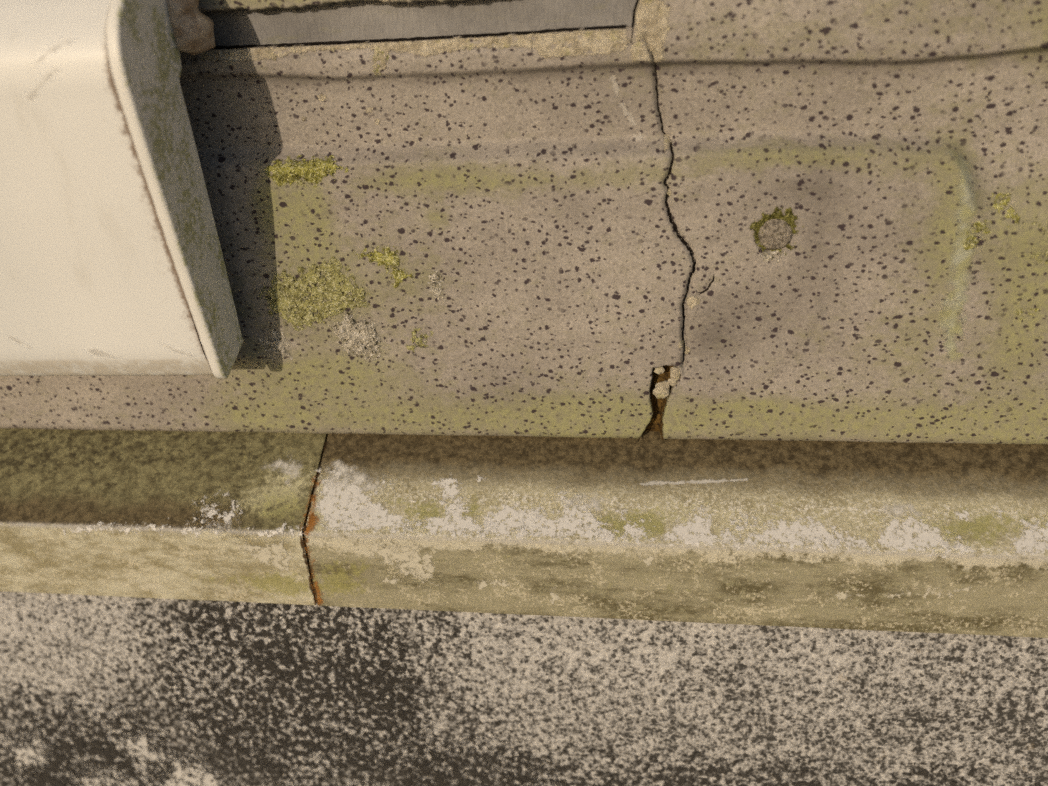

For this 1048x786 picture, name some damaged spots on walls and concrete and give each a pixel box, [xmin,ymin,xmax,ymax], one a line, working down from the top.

crack [630,0,714,364]
rust [300,443,326,605]
damp [640,478,748,486]